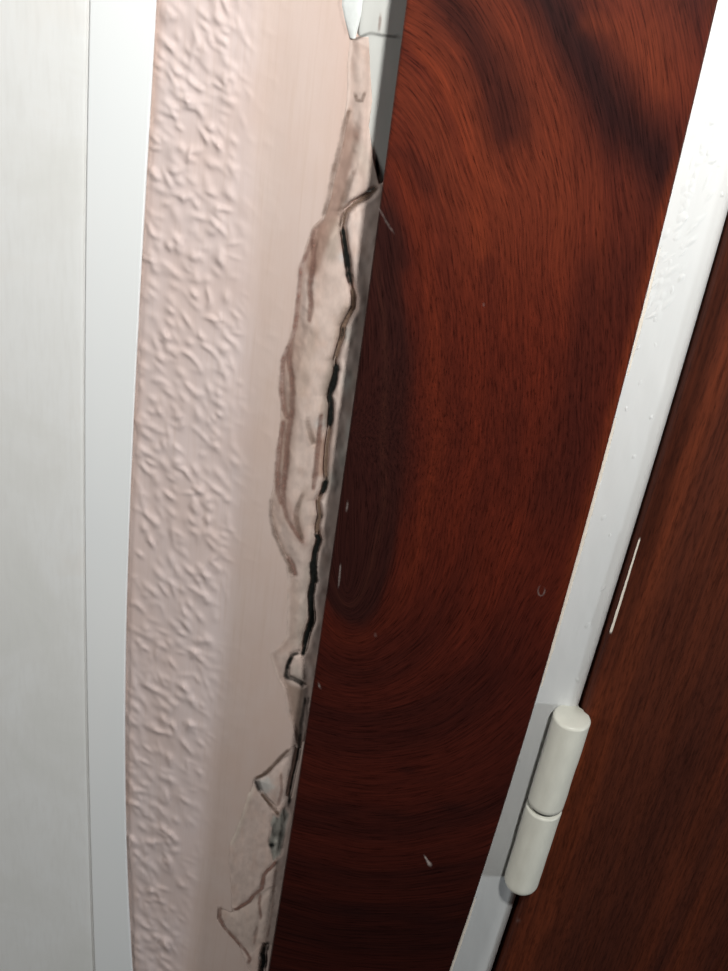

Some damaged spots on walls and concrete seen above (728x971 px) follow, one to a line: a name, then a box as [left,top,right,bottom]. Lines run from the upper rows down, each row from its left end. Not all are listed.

flaking render [217,742,304,971]